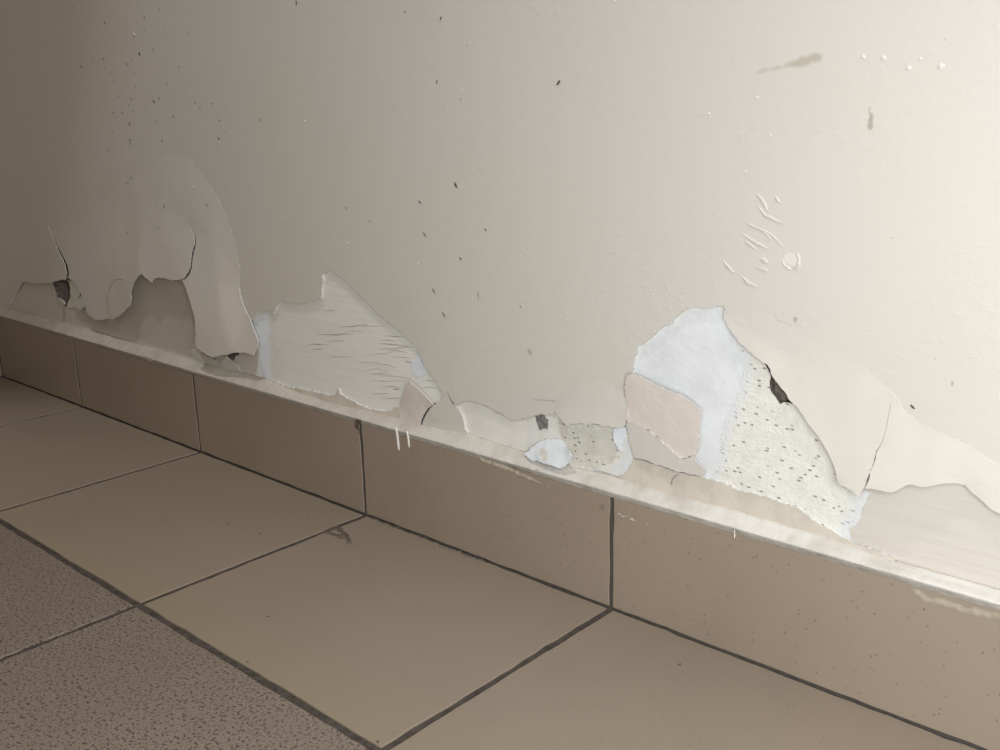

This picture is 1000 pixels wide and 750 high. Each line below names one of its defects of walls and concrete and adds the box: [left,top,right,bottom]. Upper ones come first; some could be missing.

peeling [6,154,442,424]
peeling [457,306,1000,561]